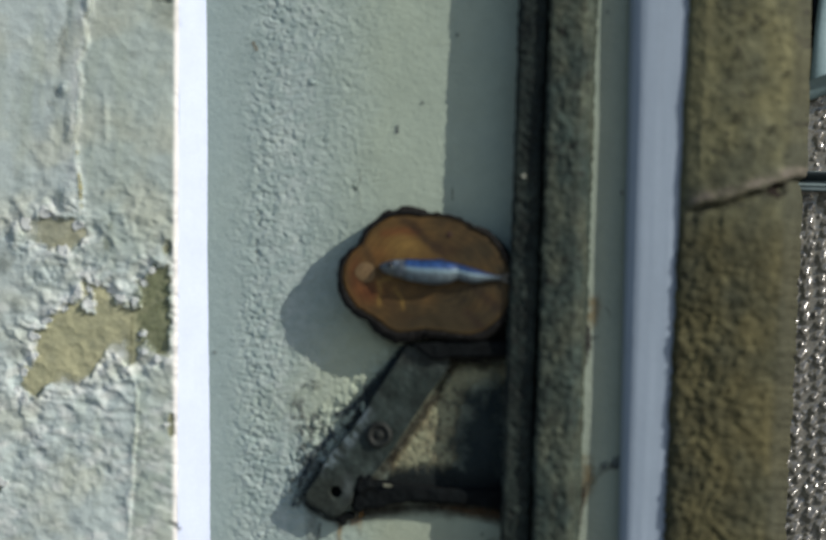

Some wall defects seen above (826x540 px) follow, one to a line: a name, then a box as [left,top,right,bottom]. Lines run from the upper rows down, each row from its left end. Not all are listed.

crack [769,184,788,198]
peeling [20,206,86,258]
peeling [13,265,171,402]